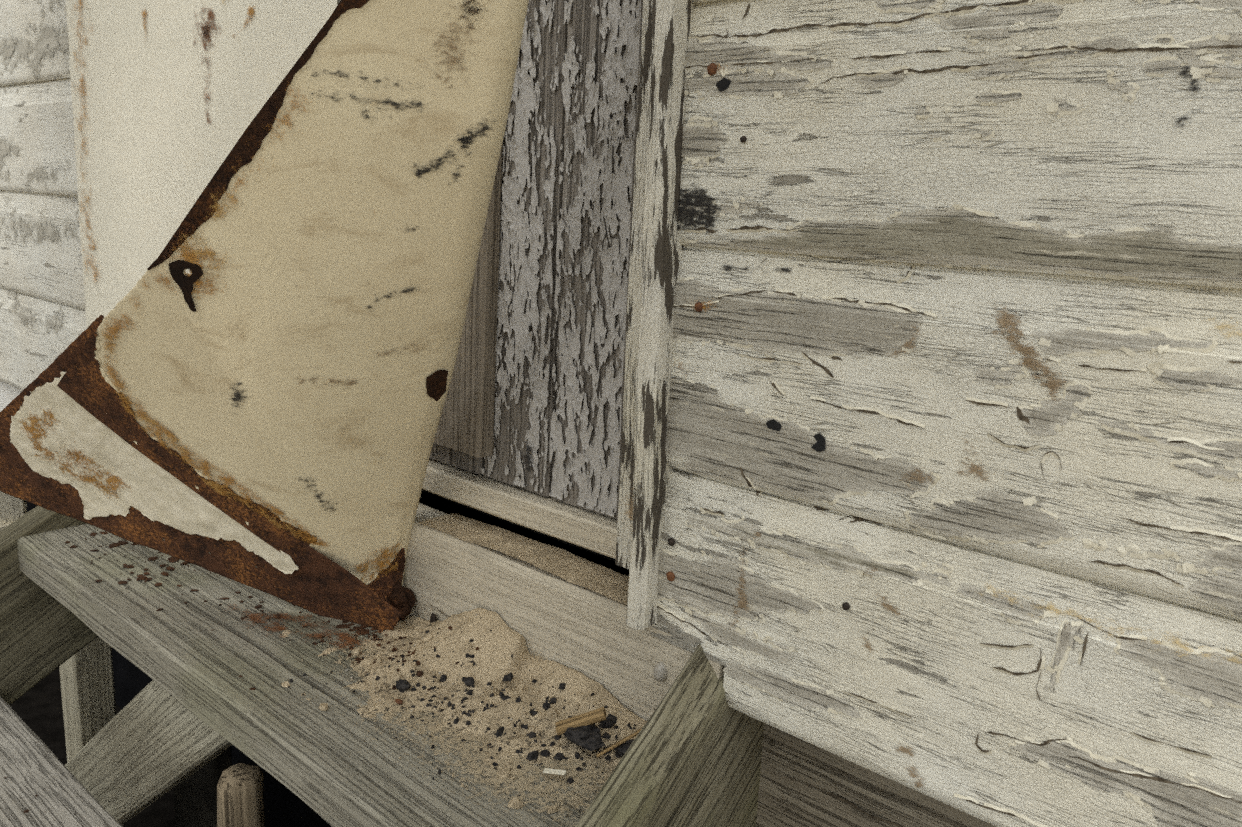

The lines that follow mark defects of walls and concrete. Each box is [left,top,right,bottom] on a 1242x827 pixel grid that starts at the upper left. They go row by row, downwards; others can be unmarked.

crack [685,0,1242,83]
corrosion [57,0,371,580]
peeling [481,0,641,517]
peeling [672,277,923,359]
peeling [684,204,1242,282]
corrosion [20,410,124,496]
peeling [665,378,1242,580]
corrosion [356,544,406,602]
corrosion [230,606,364,649]
peeling [657,508,1084,723]
crack [980,643,1045,700]
crack [1074,615,1147,665]